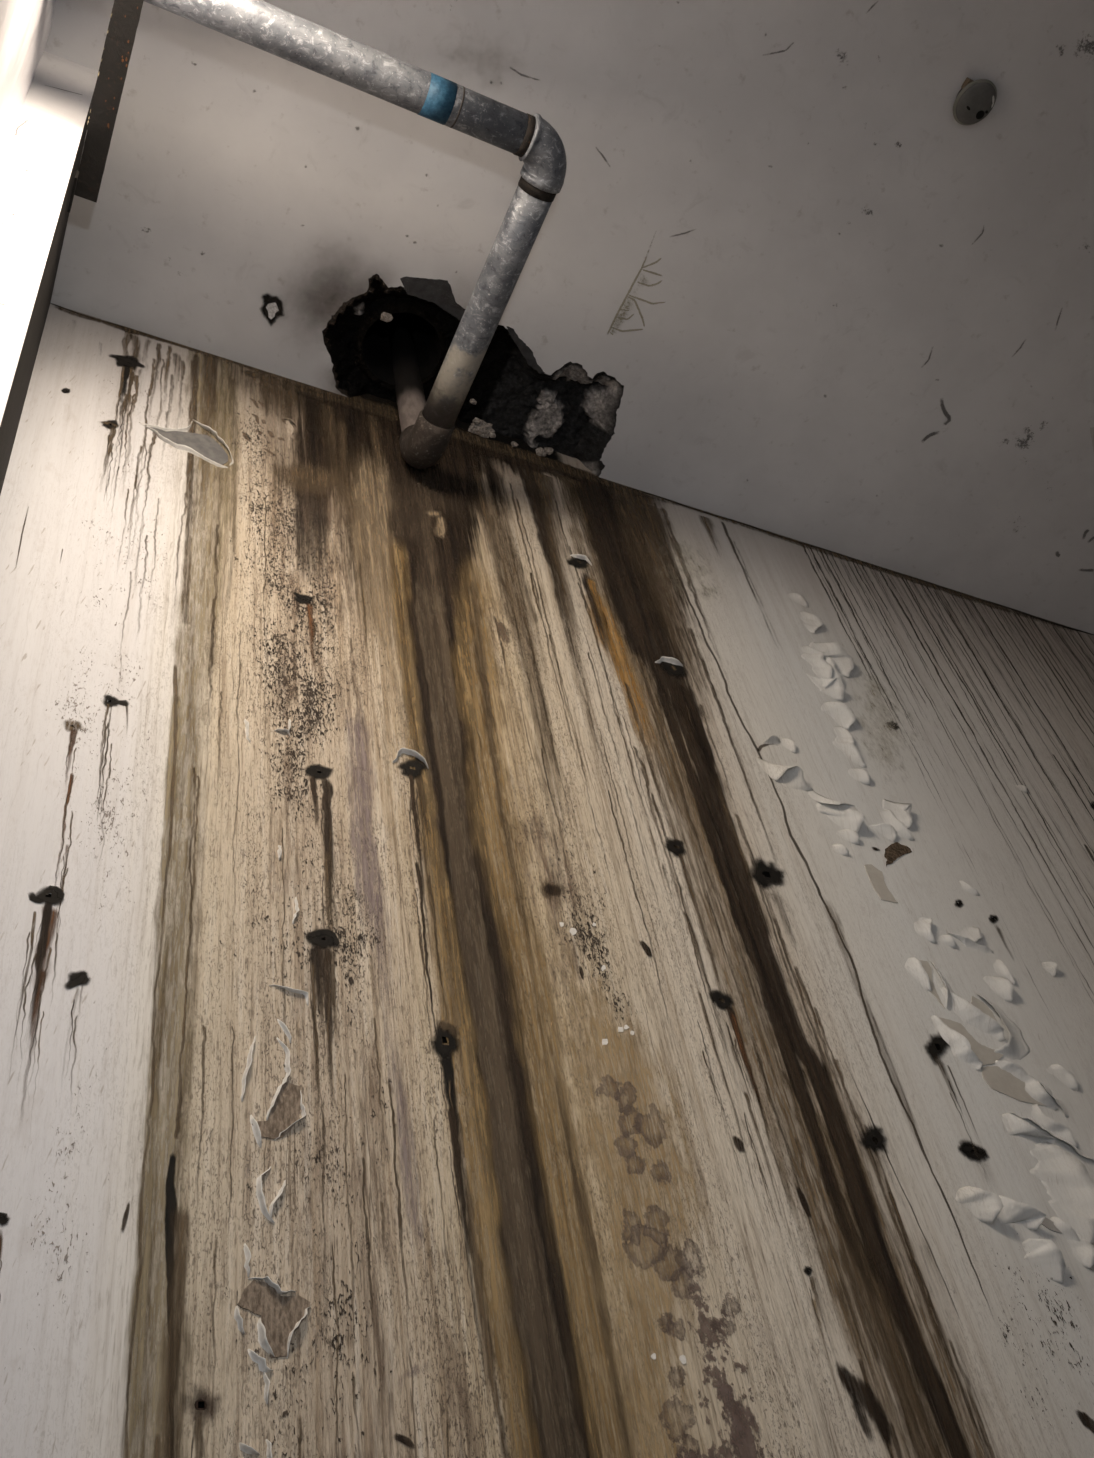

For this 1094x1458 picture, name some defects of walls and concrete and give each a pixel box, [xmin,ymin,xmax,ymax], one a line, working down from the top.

spalling [139,420,234,468]
rust [582,576,610,643]
peeling [787,593,871,785]
rust [310,777,333,920]
water stain [46,309,1094,1458]
peeling [756,734,914,903]
rust [20,902,57,1040]
peeling [241,1019,306,1147]
rust [310,946,335,1066]
peeling [905,917,1094,1283]
water stain [31,1079,88,1306]
peeling [234,1243,310,1404]